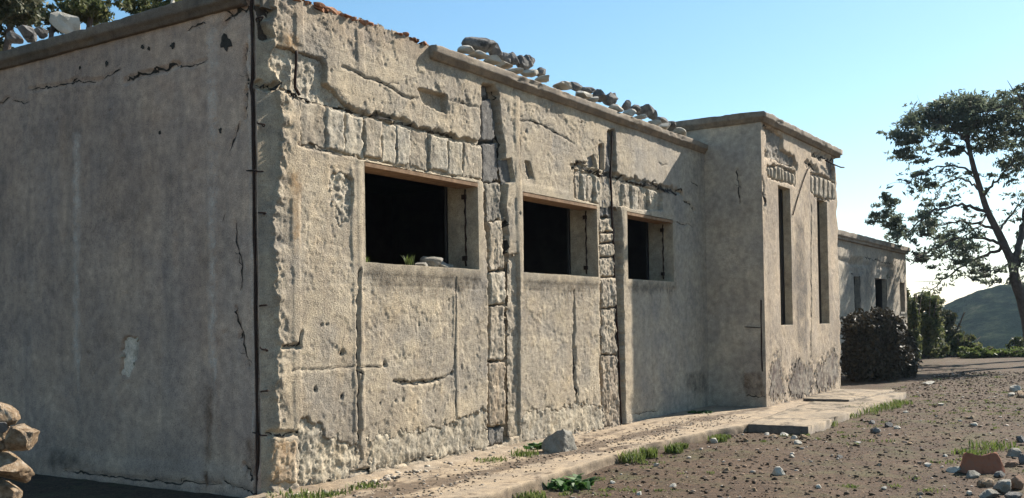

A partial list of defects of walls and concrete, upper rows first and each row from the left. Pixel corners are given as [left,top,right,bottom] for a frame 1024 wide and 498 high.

crack [0,59,208,104]
crack [518,120,697,227]
crack [735,169,766,206]
crack [222,215,250,367]
spalling [246,0,660,495]
spalling [120,337,139,377]
crack [283,269,459,439]
peeling [749,300,840,404]